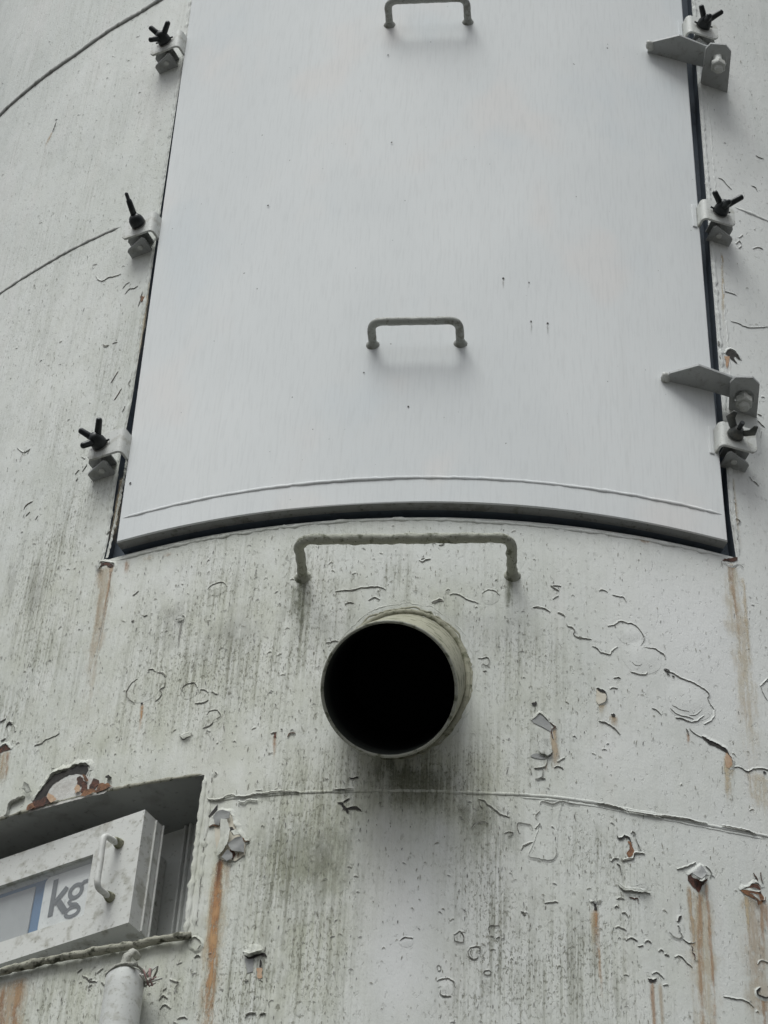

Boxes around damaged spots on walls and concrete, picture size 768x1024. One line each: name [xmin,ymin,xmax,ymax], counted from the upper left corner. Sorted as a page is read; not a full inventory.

peeling [702,733,735,771]
crack [207,769,299,803]
crack [332,775,363,813]
peeling [208,804,251,861]
crack [471,797,540,838]
crack [597,801,756,834]
crack [196,838,205,926]
peeling [589,830,651,918]
peeling [676,861,713,892]
peeling [738,872,766,906]
rust [206,861,222,1016]
peeling [242,943,267,981]